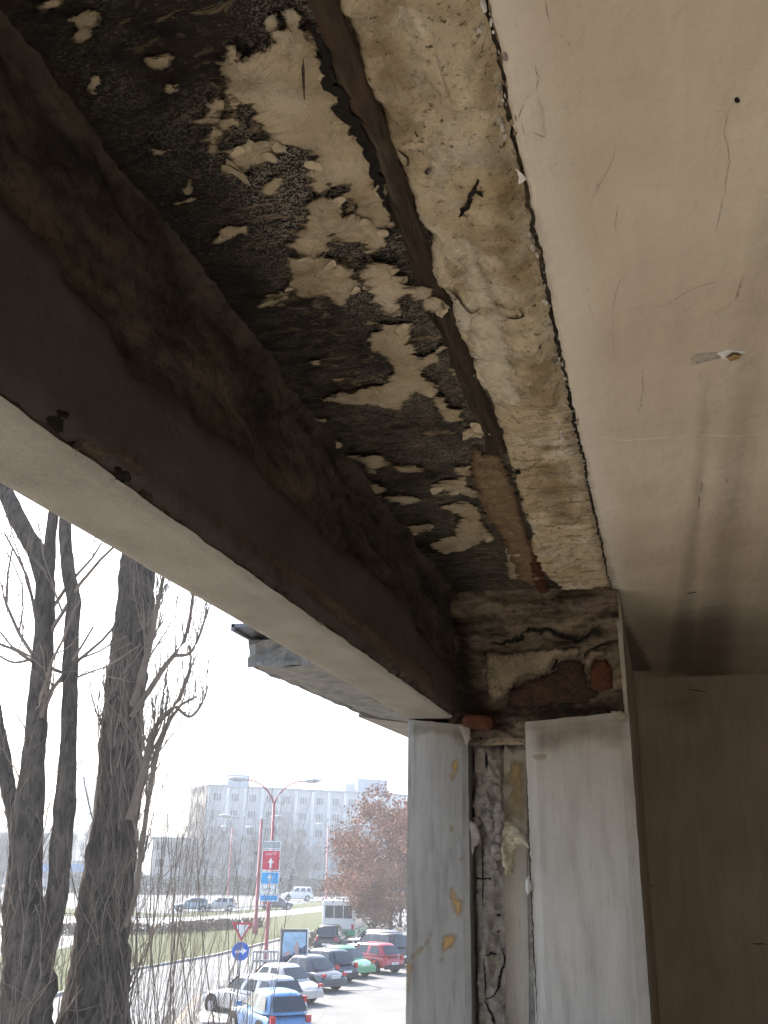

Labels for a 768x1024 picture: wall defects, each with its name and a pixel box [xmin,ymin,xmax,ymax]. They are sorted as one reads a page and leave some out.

peeling [36,0,65,13]
peeling [67,9,102,44]
peeling [143,53,176,71]
peeling [86,76,101,95]
peeling [173,179,197,205]
peeling [192,7,549,594]
crack [485,0,758,583]
spalling [113,467,140,482]
crack [491,627,610,671]
peeling [483,646,613,703]
crack [475,837,488,902]
crack [483,948,506,1024]